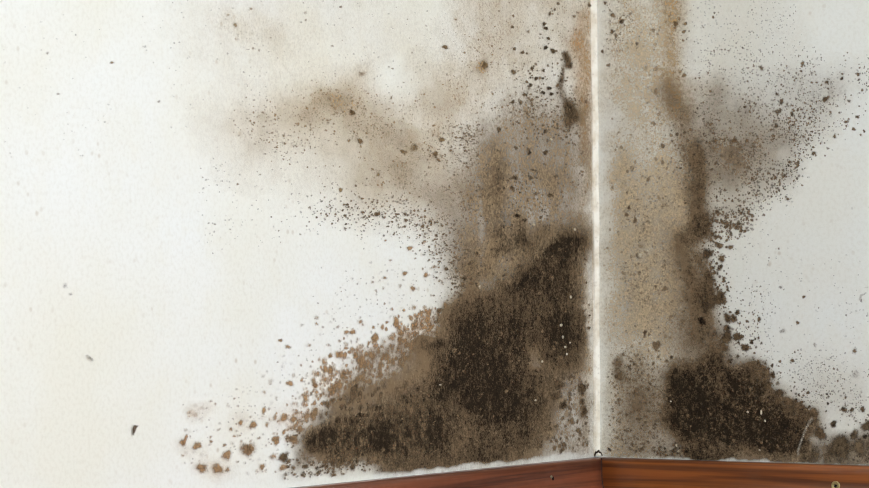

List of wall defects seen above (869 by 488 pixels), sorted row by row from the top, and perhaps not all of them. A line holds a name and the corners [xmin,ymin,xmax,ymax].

leakage [240,2,593,479]
leakage [601,0,869,465]